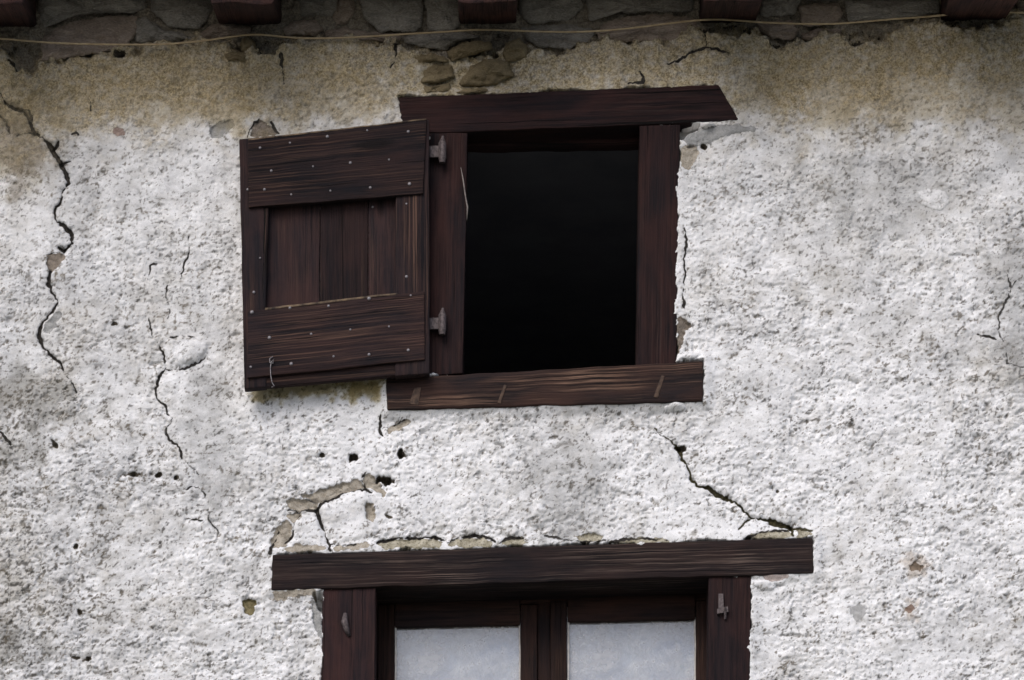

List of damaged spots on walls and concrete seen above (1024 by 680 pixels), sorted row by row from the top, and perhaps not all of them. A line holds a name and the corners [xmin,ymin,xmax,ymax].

crack [667,34,728,65]
spalling [679,123,758,170]
crack [0,93,92,394]
crack [977,274,1024,368]
crack [147,236,219,534]
spalling [270,473,528,554]
crack [268,472,667,555]
spalling [574,533,603,545]
crack [654,428,813,540]
spalling [744,530,812,540]